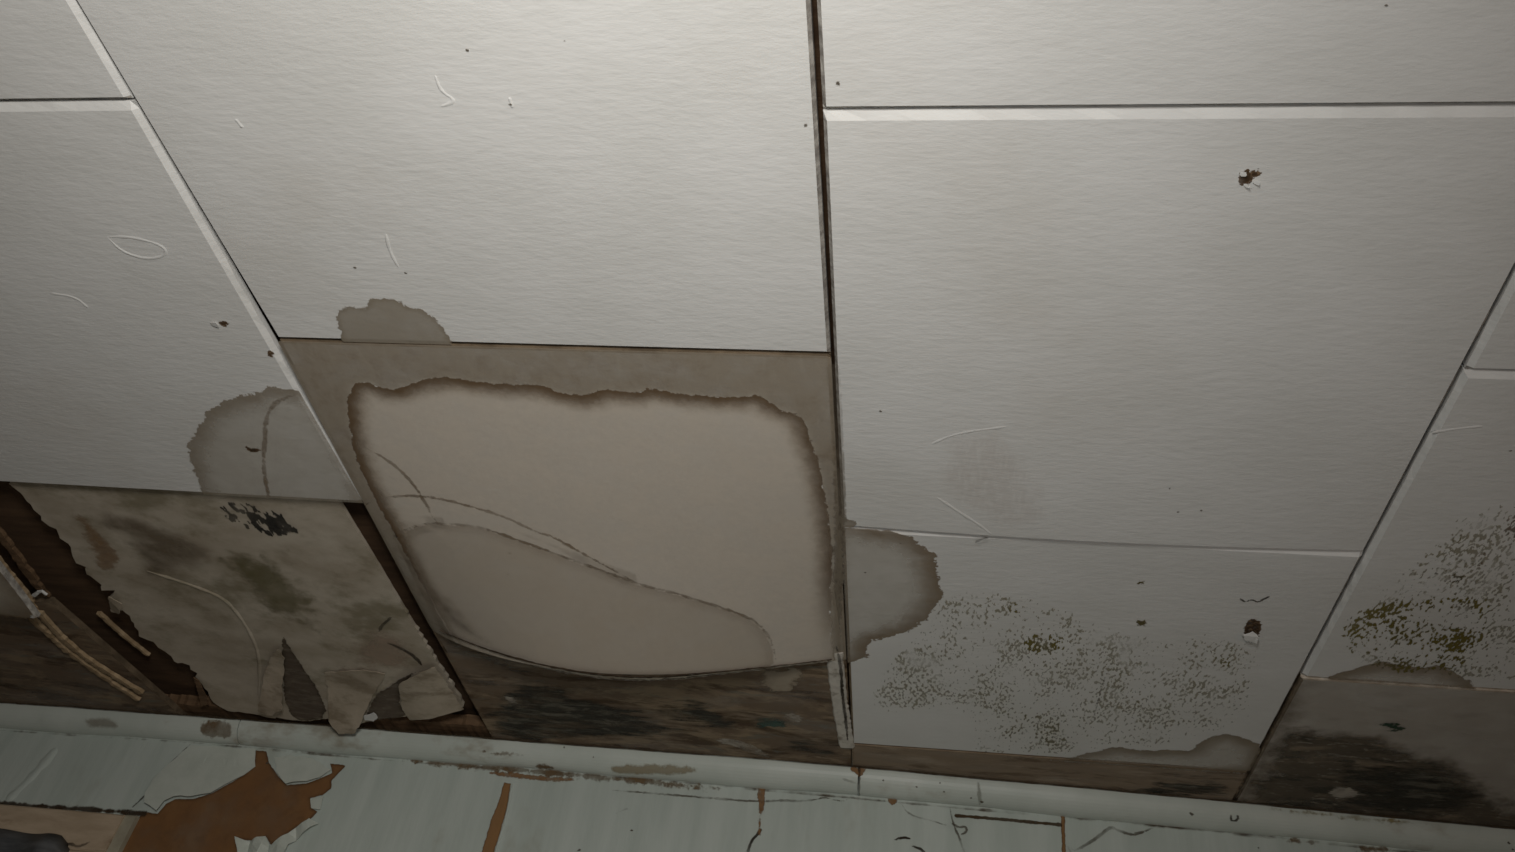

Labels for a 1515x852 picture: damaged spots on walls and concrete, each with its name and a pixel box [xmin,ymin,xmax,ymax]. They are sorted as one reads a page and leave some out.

leakage [187,298,1515,827]
leakage [0,572,178,714]
peeling [123,745,345,852]